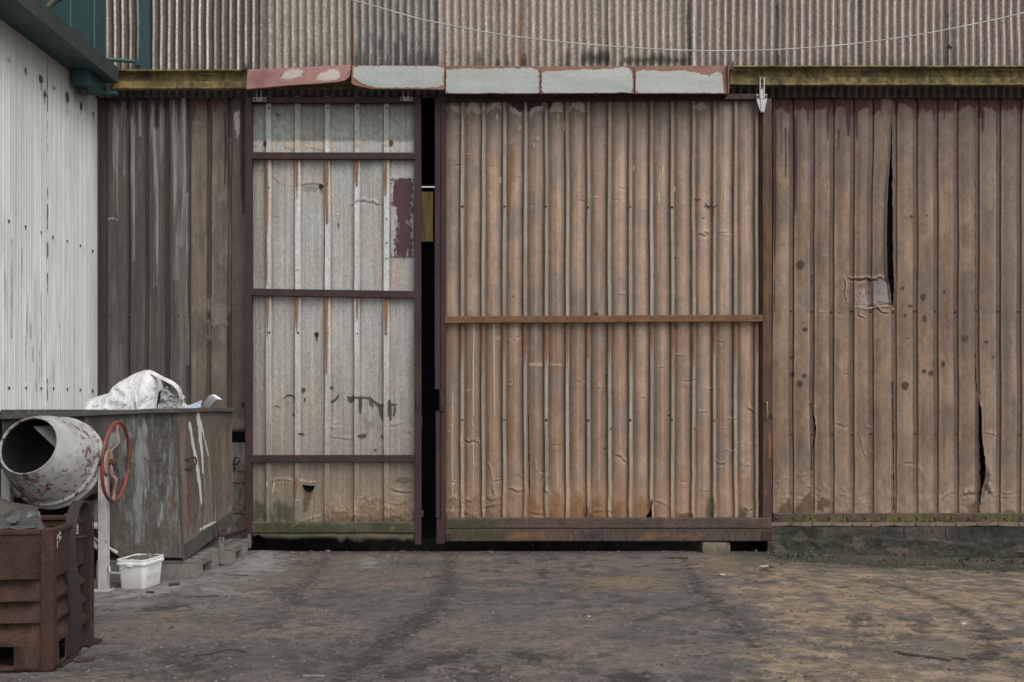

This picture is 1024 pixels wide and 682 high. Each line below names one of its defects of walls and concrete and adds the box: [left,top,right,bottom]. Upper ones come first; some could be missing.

peeling [316,65,724,93]
damp [113,97,189,340]
peeling [857,277,889,307]